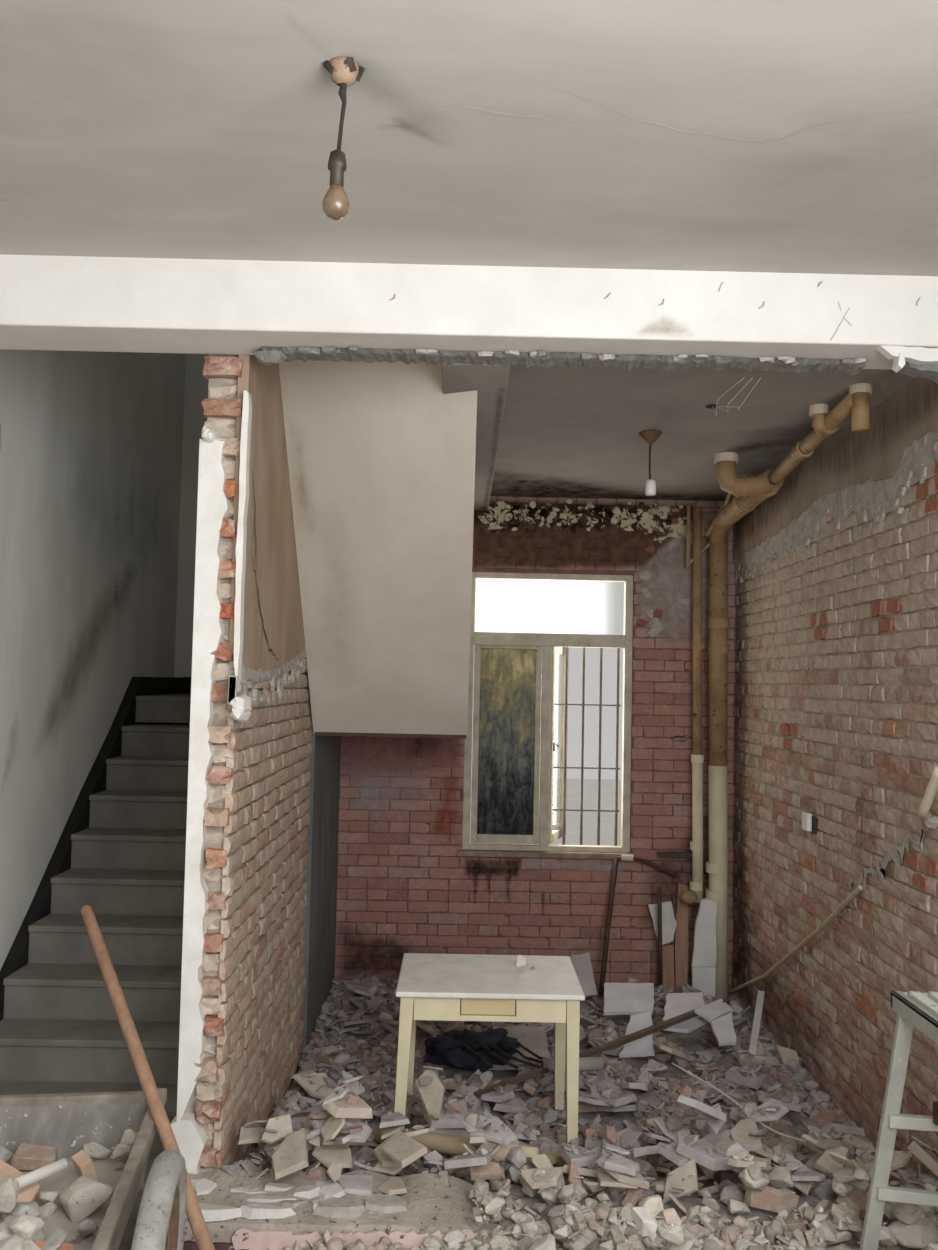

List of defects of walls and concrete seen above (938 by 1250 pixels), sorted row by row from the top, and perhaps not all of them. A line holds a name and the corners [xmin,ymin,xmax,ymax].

spalling [252,346,867,376]
peeling [892,353,905,373]
flaking render [728,431,938,585]
peeling [473,499,723,640]
spalling [810,612,827,640]
spalling [871,599,901,633]
spalling [780,723,798,750]
flaking render [170,390,307,1174]
leakage [467,861,518,893]
spalling [907,852,938,892]